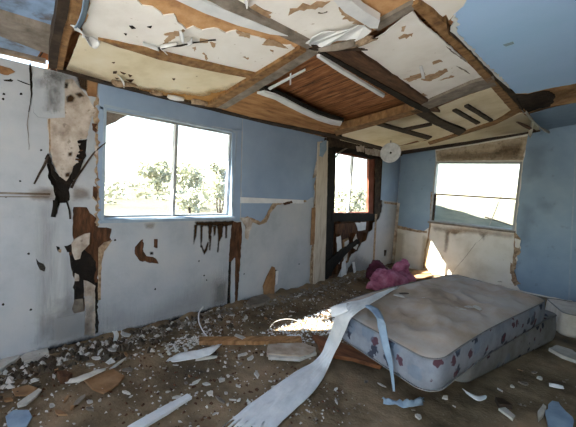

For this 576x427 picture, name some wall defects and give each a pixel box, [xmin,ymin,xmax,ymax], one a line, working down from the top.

peeling [288,1,330,16]
peeling [163,29,185,44]
peeling [0,65,15,82]
peeling [404,66,454,82]
crack [18,63,33,143]
peeling [516,90,555,112]
peeling [72,143,84,181]
peeling [58,233,90,260]
peeling [135,239,158,264]
damp [194,221,233,254]
peeling [336,222,366,252]
peeling [72,240,112,336]